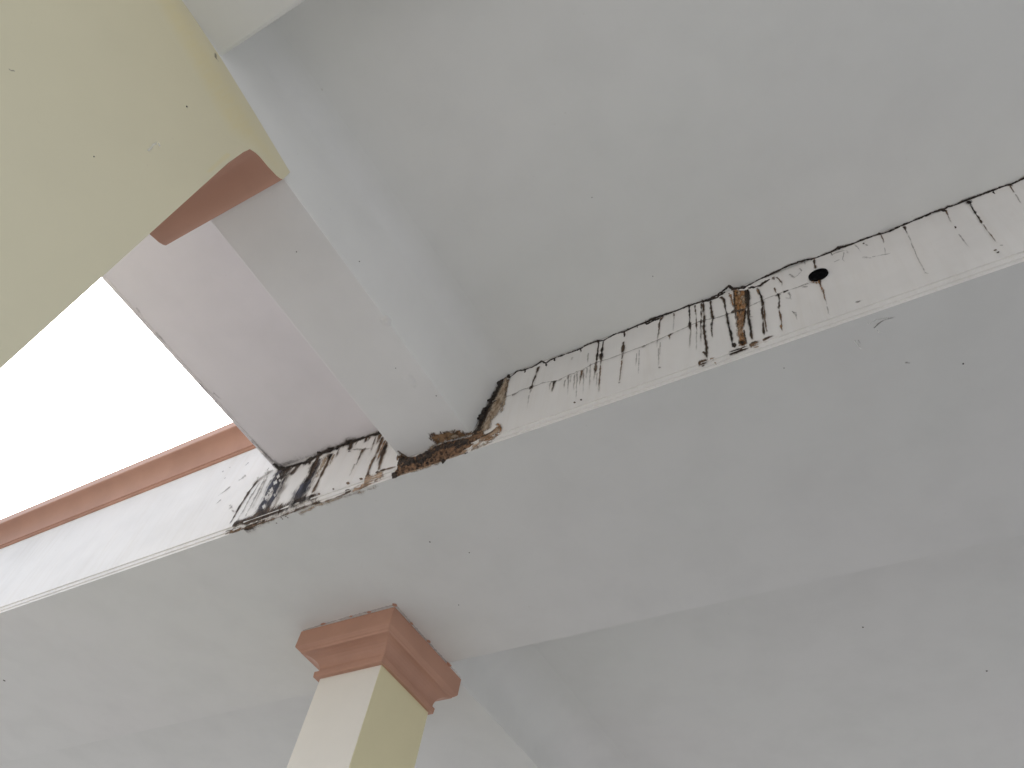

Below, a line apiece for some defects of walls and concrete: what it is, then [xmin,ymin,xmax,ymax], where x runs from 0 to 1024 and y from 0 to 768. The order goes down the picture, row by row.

crack [473,176,1024,435]
crack [273,431,381,471]
spalling [392,429,495,479]